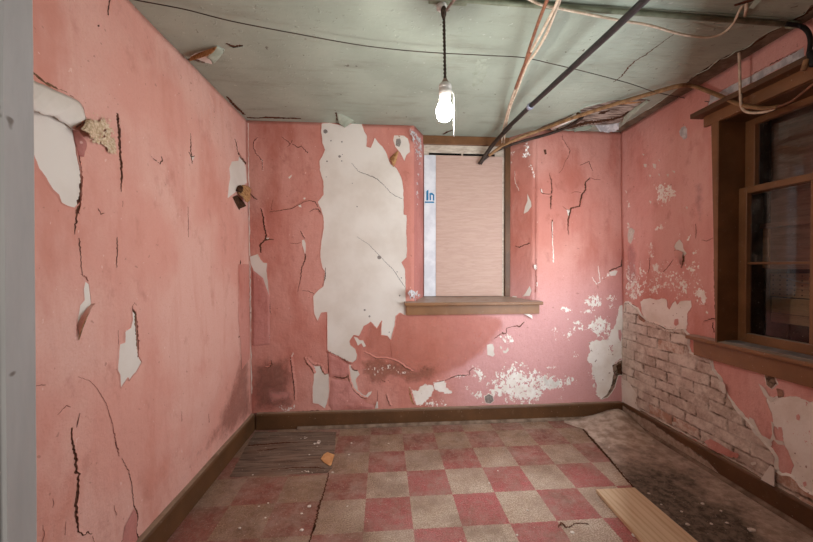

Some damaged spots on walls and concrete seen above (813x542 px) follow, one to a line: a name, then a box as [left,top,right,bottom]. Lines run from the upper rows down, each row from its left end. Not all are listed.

crack [614,34,674,82]
peeling [33,72,117,234]
peeling [77,274,95,339]
peeling [116,303,142,389]
peeling [293,112,422,409]
flaking render [465,334,577,404]
crack [514,134,600,292]
flaking render [554,267,615,341]
flaking render [601,234,813,507]
crack [71,414,95,542]
crack [80,377,139,538]
peeling [583,429,813,542]